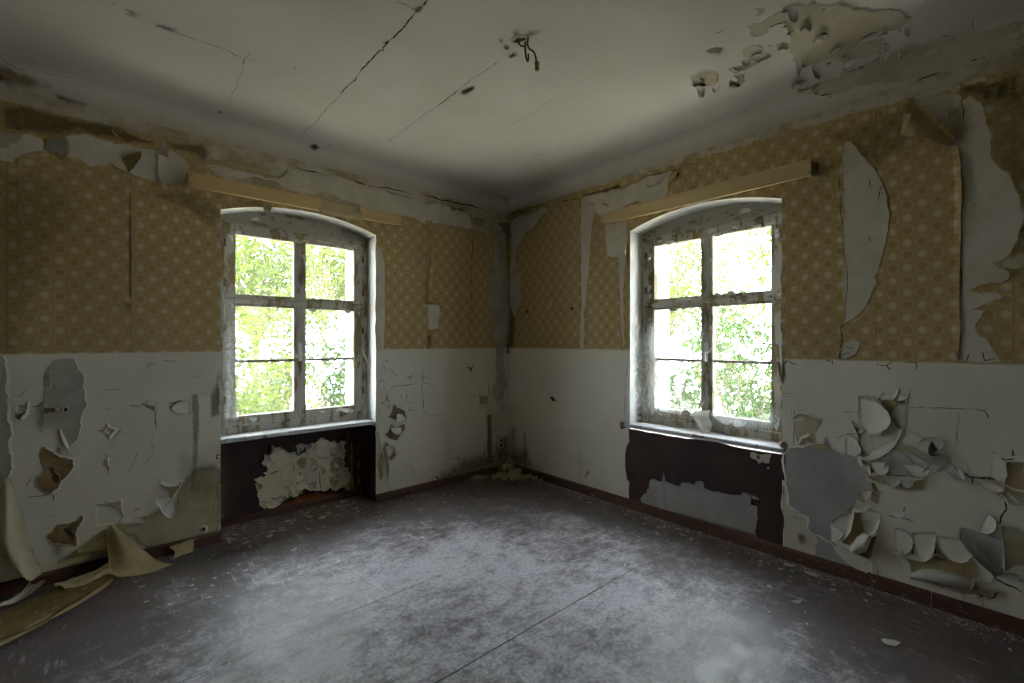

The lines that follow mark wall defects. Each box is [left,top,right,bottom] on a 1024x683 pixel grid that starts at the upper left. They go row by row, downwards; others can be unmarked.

crack [113,3,249,105]
crack [301,0,428,136]
crack [390,63,496,140]
peeling [689,1,913,98]
peeling [0,126,471,230]
peeling [580,169,677,218]
peeling [509,207,549,347]
peeling [0,355,88,495]
peeling [45,468,221,551]
peeling [253,435,351,510]
peeling [750,387,965,582]
peeling [893,449,1024,610]